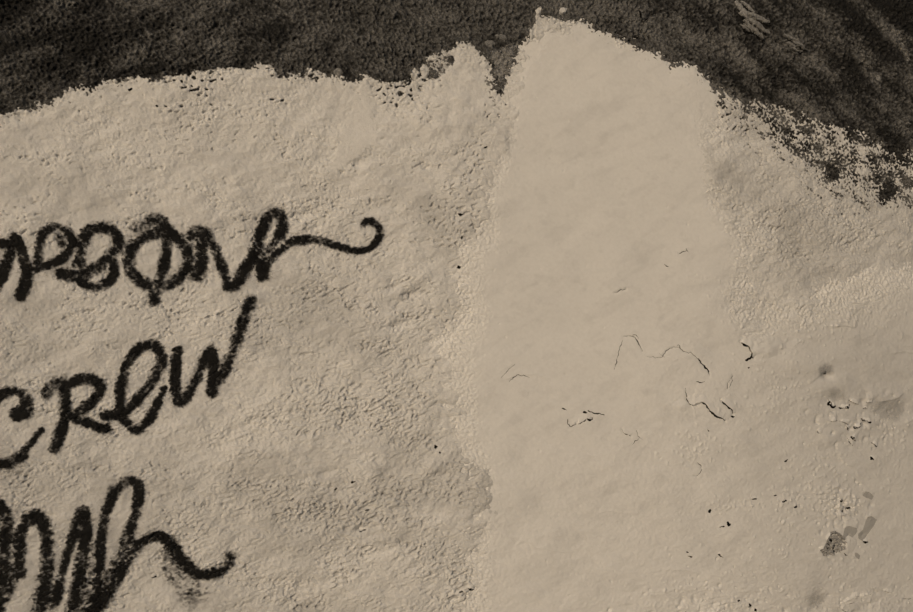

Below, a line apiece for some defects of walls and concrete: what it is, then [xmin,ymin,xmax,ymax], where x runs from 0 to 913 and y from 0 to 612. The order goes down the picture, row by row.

crack [614,334,756,421]
peeling [827,398,872,446]
spalling [819,516,877,559]